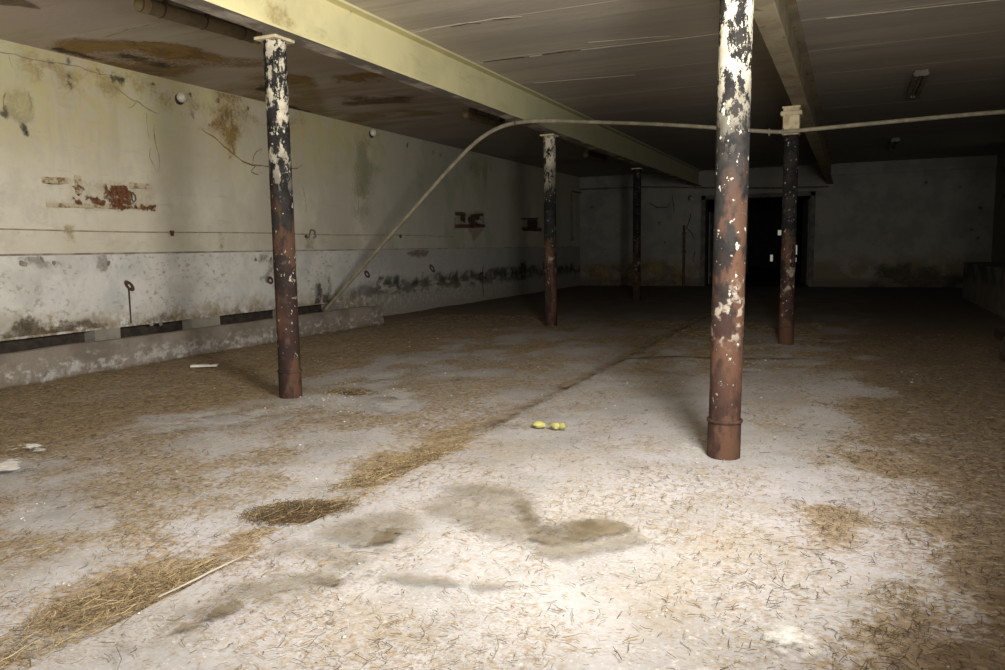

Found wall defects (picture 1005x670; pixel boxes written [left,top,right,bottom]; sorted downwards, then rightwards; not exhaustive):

spalling [0,0,40,9]
leakage [52,39,264,85]
rust [41,175,156,211]
leakage [377,262,544,288]
leakage [315,280,329,304]